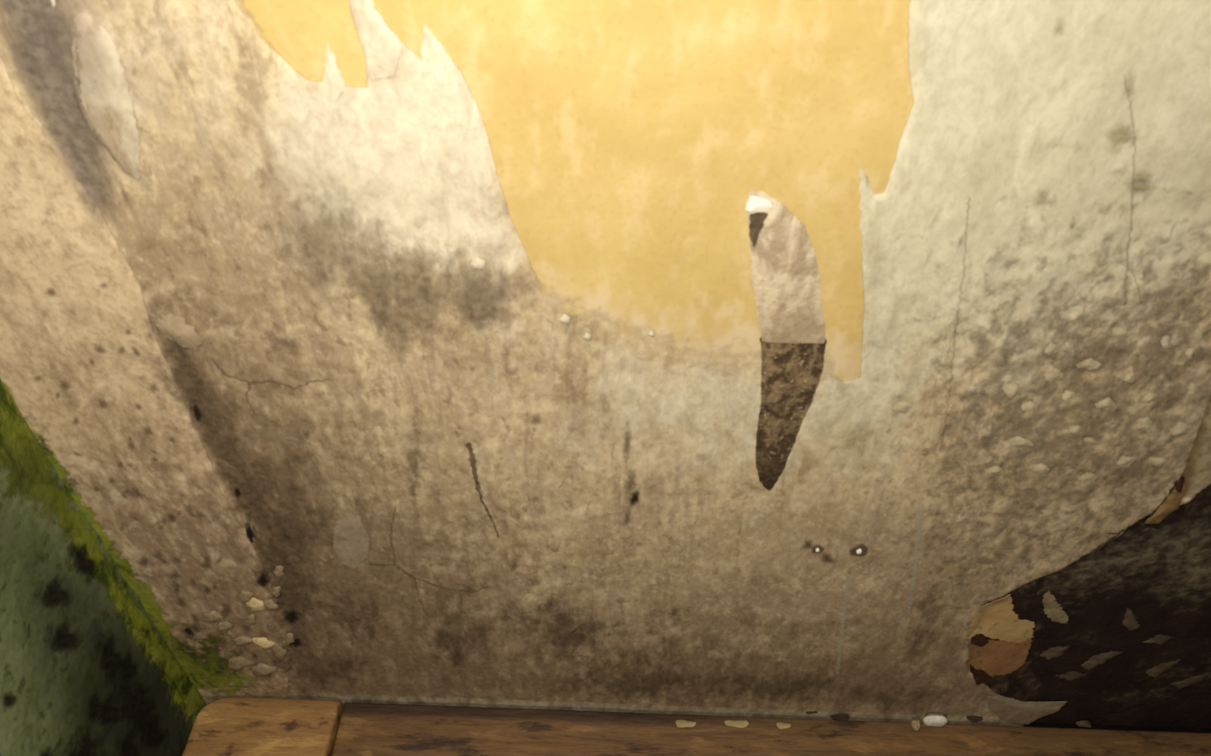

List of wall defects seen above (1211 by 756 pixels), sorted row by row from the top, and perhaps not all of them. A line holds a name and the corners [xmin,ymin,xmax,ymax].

damp [300,226,516,321]
peeling [241,0,914,490]
peeling [0,57,294,705]
crack [466,442,499,538]
mould [43,579,68,606]
mould [51,624,76,650]
mould [68,545,96,579]
peeling [966,396,1211,733]
mould [4,693,16,706]
mould [41,638,165,756]